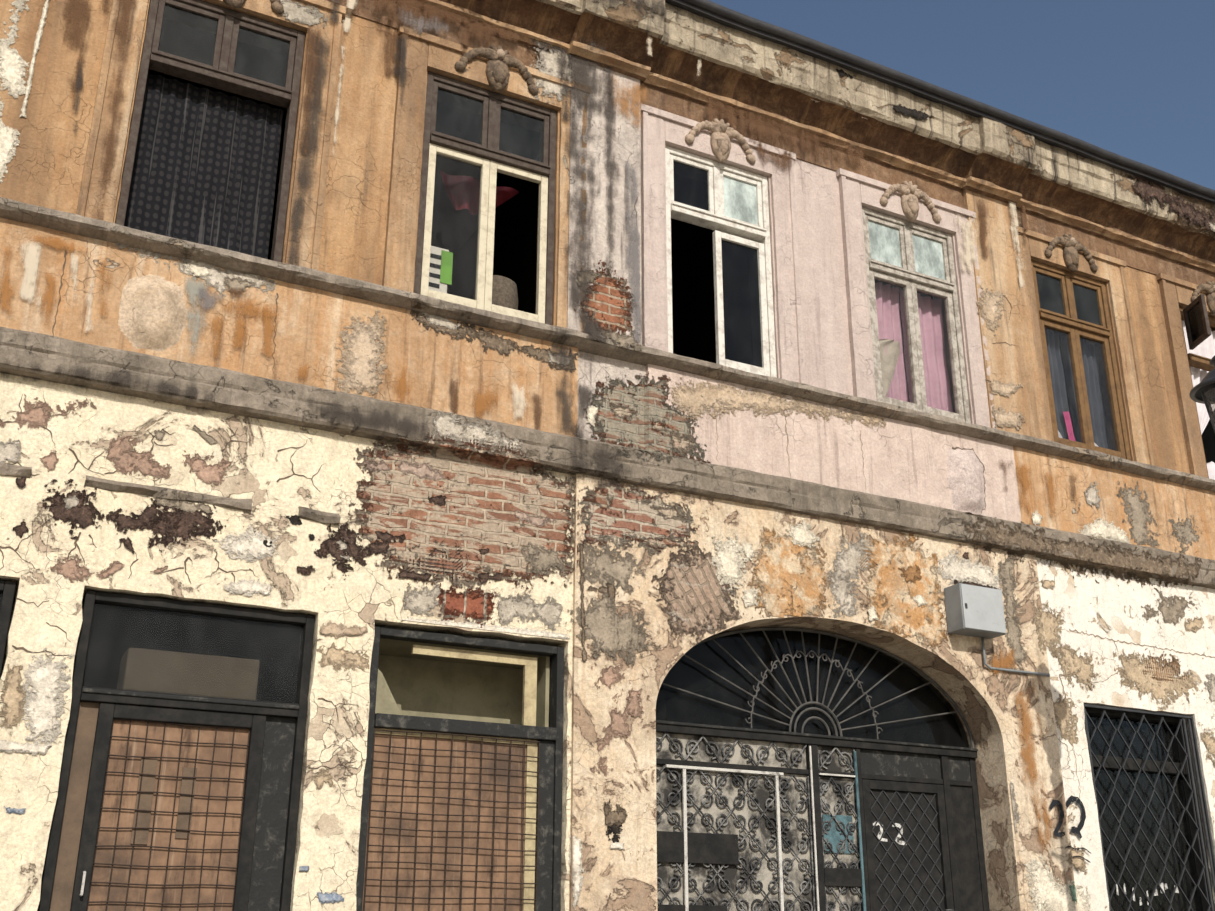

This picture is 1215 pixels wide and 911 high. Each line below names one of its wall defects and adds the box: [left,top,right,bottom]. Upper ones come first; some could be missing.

leakage [330,0,356,32]
leakage [63,0,137,188]
leakage [289,28,344,265]
leakage [374,0,646,339]
crack [0,394,126,475]
peeling [104,425,235,489]
crack [221,428,322,485]
flaking render [585,372,891,468]
crack [12,598,72,656]
crack [0,517,257,583]
spalling [39,447,280,582]
flaking render [286,411,1215,775]